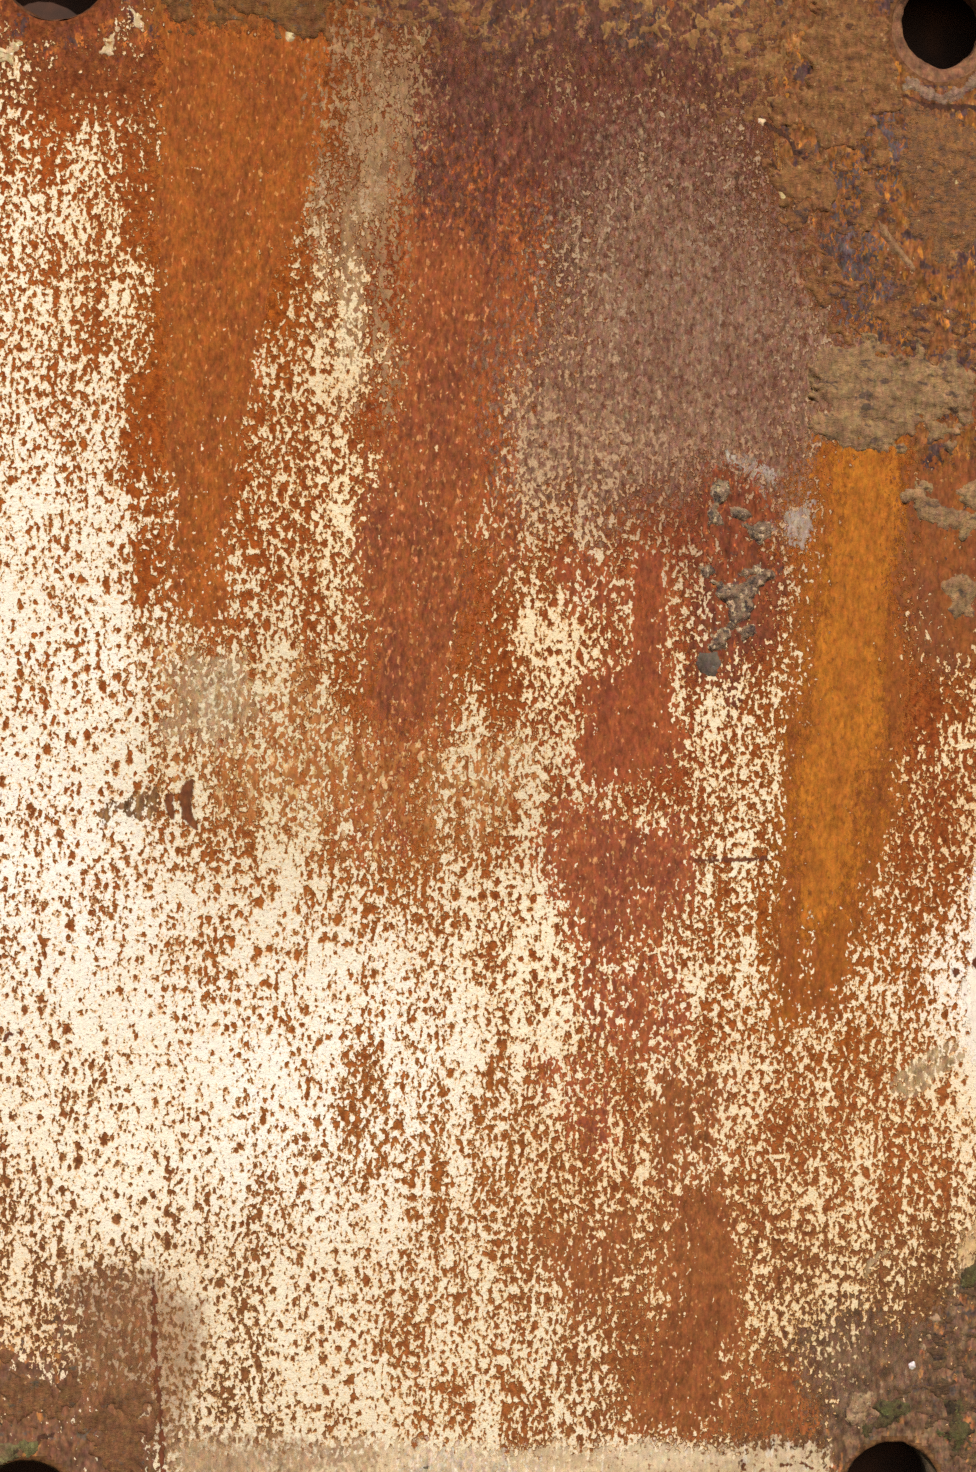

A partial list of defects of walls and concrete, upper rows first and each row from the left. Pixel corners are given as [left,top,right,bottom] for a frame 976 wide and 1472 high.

peeling [0,27,23,67]
rust [725,0,785,60]
rust [758,412,976,1050]
spalling [165,779,198,830]
rust [0,1252,184,1472]
peeling [0,1349,160,1472]
peeling [396,1436,555,1472]